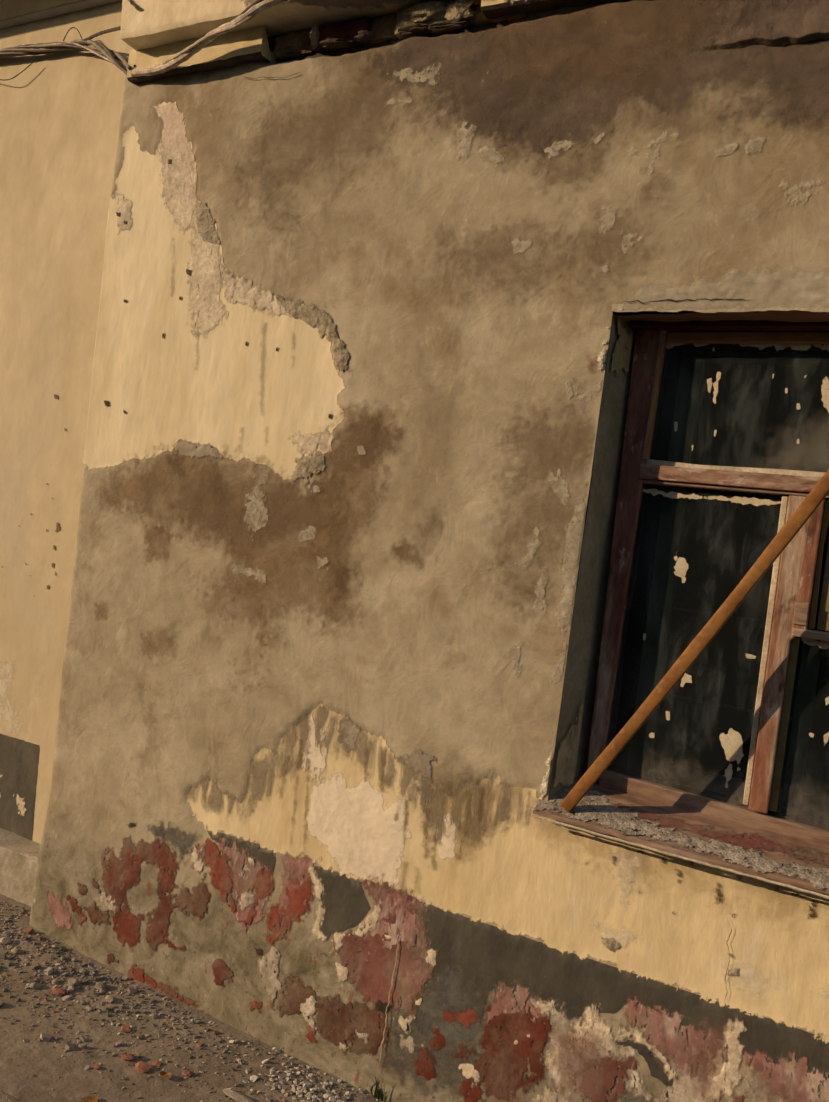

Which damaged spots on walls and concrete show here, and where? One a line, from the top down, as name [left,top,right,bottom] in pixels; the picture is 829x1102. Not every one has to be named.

spalling [268,0,528,64]
leakage [239,0,829,215]
flaking render [83,101,350,482]
peeling [590,308,633,374]
leakage [101,407,388,645]
peeling [0,794,26,816]
flaking render [46,703,829,1102]